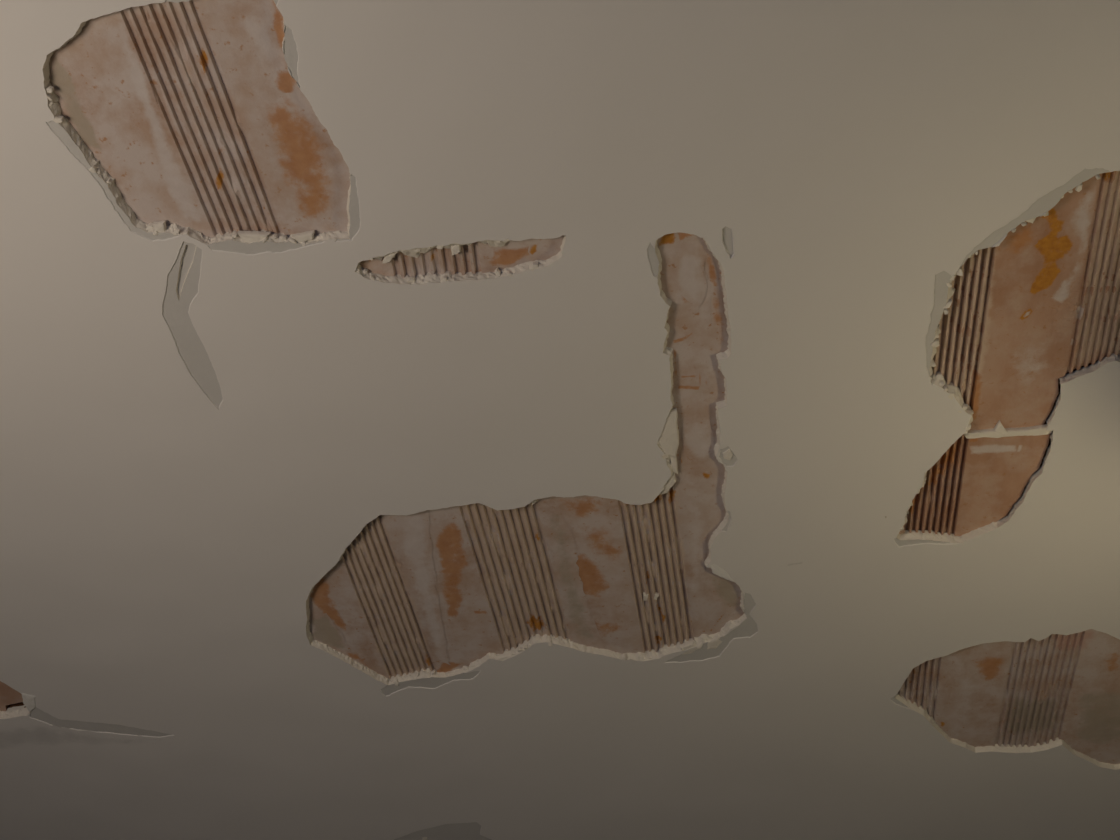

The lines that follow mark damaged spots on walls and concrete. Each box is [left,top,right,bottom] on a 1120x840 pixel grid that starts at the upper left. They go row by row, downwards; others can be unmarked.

spalling [42,0,361,410]
spalling [306,226,758,697]
spalling [894,168,1120,547]
spalling [0,681,174,738]
spalling [890,629,1120,770]